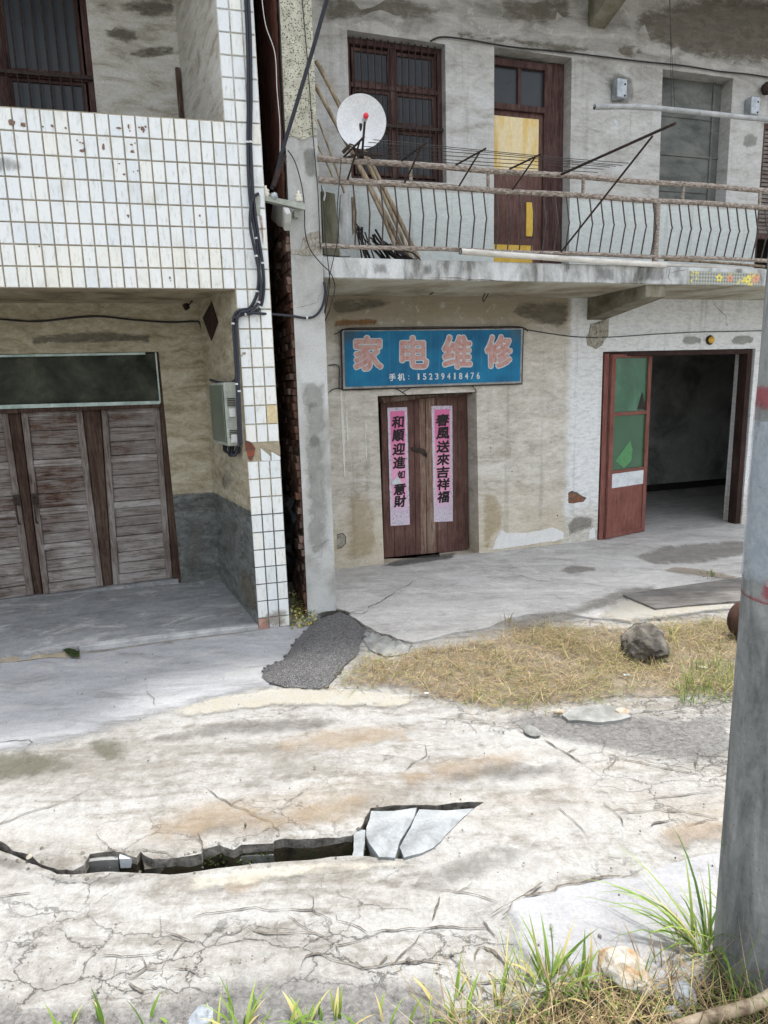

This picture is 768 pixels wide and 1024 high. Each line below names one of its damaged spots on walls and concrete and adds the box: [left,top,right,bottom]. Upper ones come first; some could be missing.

leakage [107,28,173,57]
leakage [639,0,768,62]
spalling [586,319,609,349]
spalling [245,440,280,462]
flaking render [568,491,586,503]
peeling [493,527,564,549]
crack [603,718,720,826]
crack [207,788,280,837]
crack [106,869,621,992]